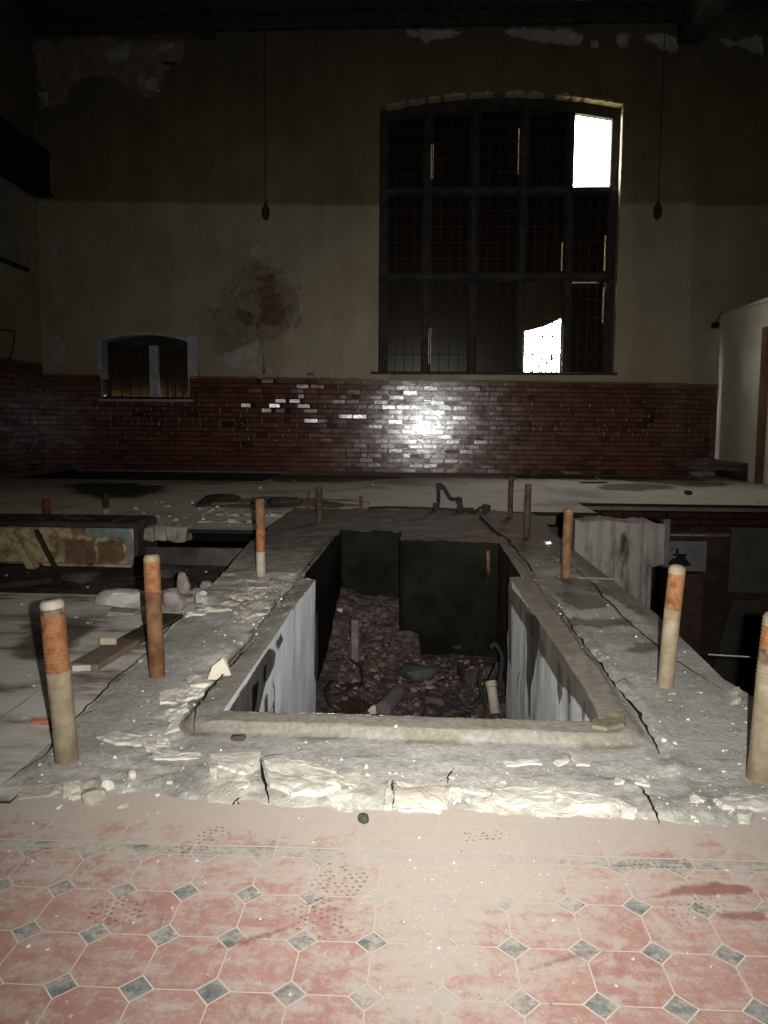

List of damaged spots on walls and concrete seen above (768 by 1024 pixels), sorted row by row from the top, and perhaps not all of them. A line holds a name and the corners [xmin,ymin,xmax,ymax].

peeling [406,28,462,44]
peeling [504,27,599,49]
peeling [616,32,679,53]
peeling [31,35,185,112]
leakage [209,244,305,374]
crack [503,531,721,762]
crack [193,641,255,731]
spalling [97,674,361,813]
spalling [14,777,114,801]
crack [232,754,277,805]
crack [639,786,660,822]